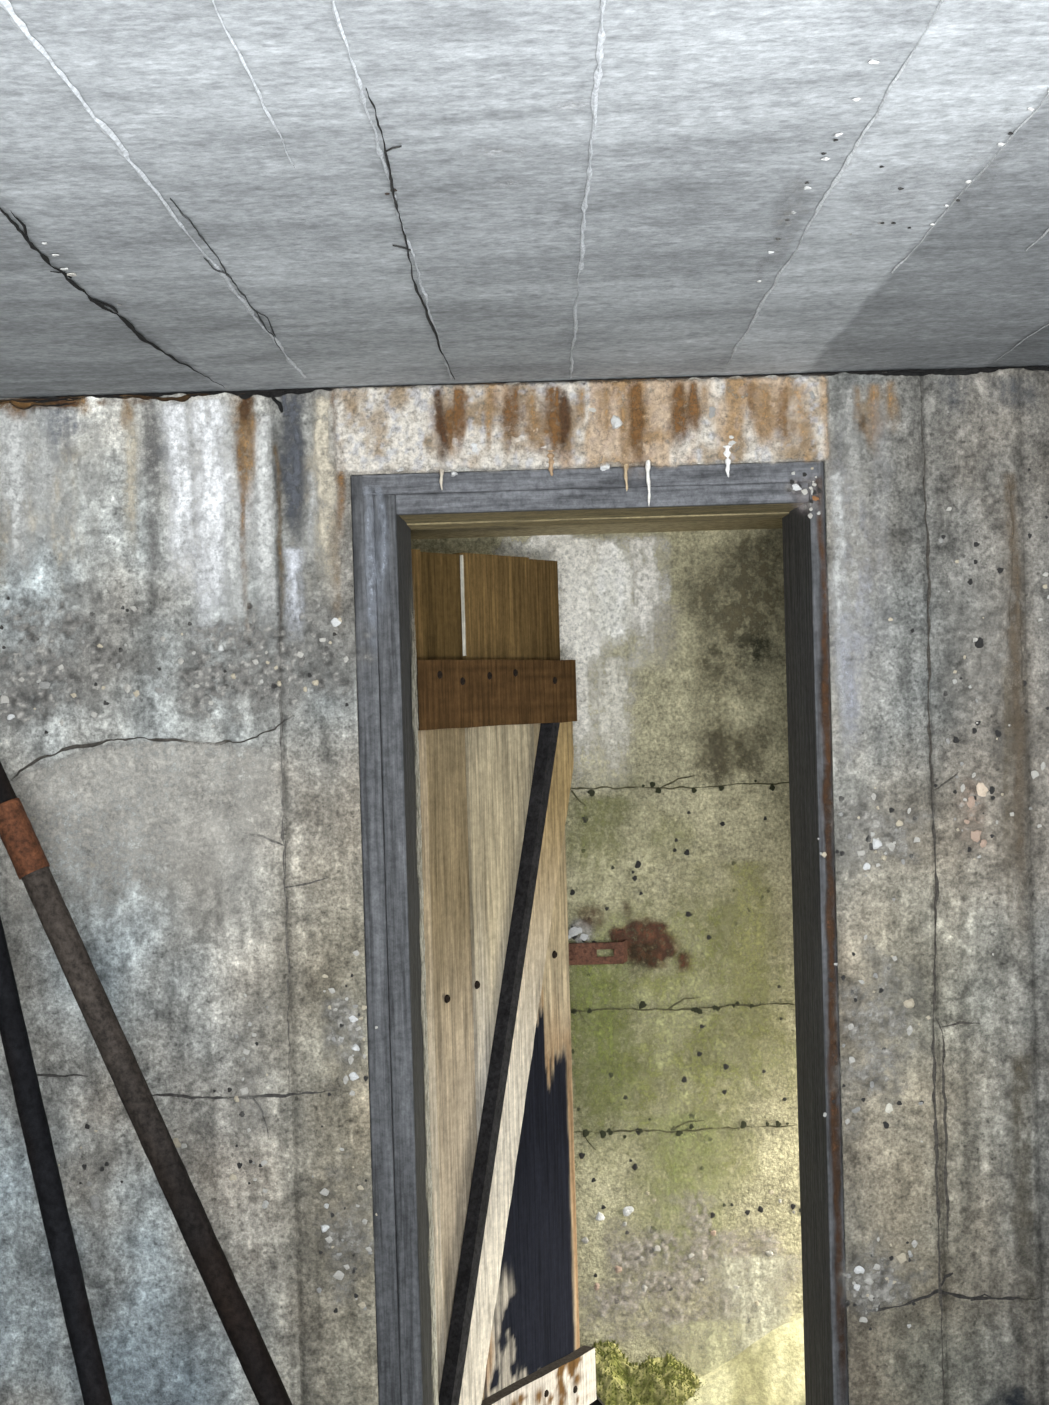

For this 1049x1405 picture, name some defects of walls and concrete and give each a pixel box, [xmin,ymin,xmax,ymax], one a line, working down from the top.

crack [0,198,417,413]
corrosion [237,393,254,529]
corrosion [434,388,467,456]
corrosion [485,386,584,450]
corrosion [671,383,705,441]
water stain [495,535,674,769]
water stain [688,536,784,707]
crack [366,88,1049,1405]
water stain [711,727,755,779]
crack [152,669,335,1132]
corrosion [609,904,689,969]
crack [37,1071,88,1079]